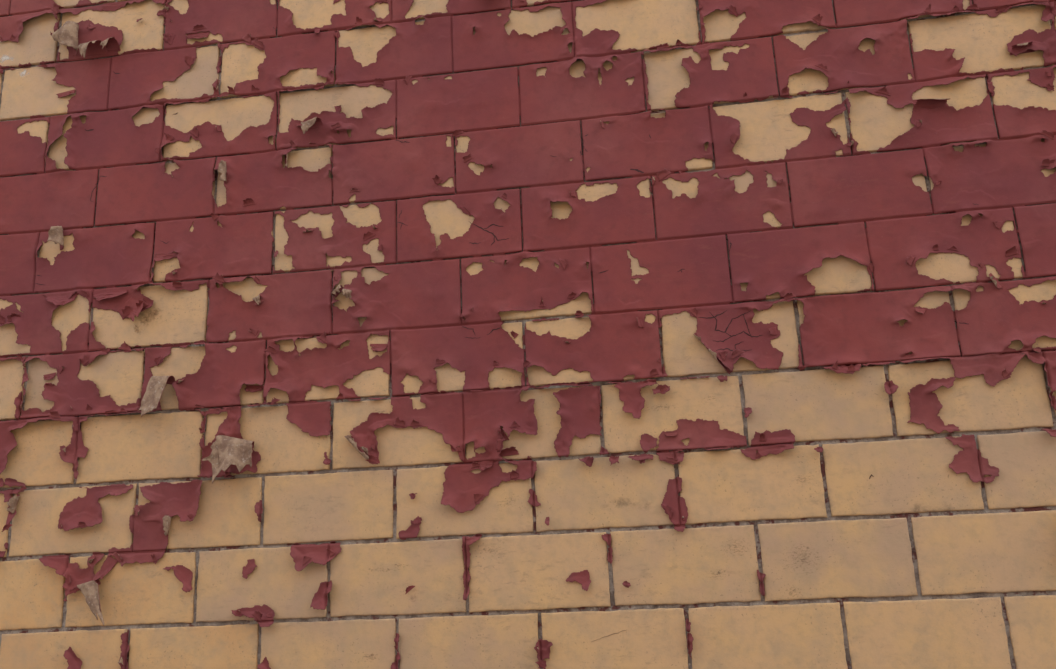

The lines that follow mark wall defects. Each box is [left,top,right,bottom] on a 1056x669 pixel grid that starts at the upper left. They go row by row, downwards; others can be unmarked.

peeling [405,0,449,25]
peeling [497,0,749,118]
peeling [637,0,1056,198]
peeling [273,188,388,311]
peeling [423,175,475,246]
peeling [551,168,618,220]
peeling [807,257,874,293]
peeling [906,244,1056,314]
crack [698,310,762,351]
peeling [752,292,810,370]
peeling [0,250,796,627]
peeling [884,337,1056,483]